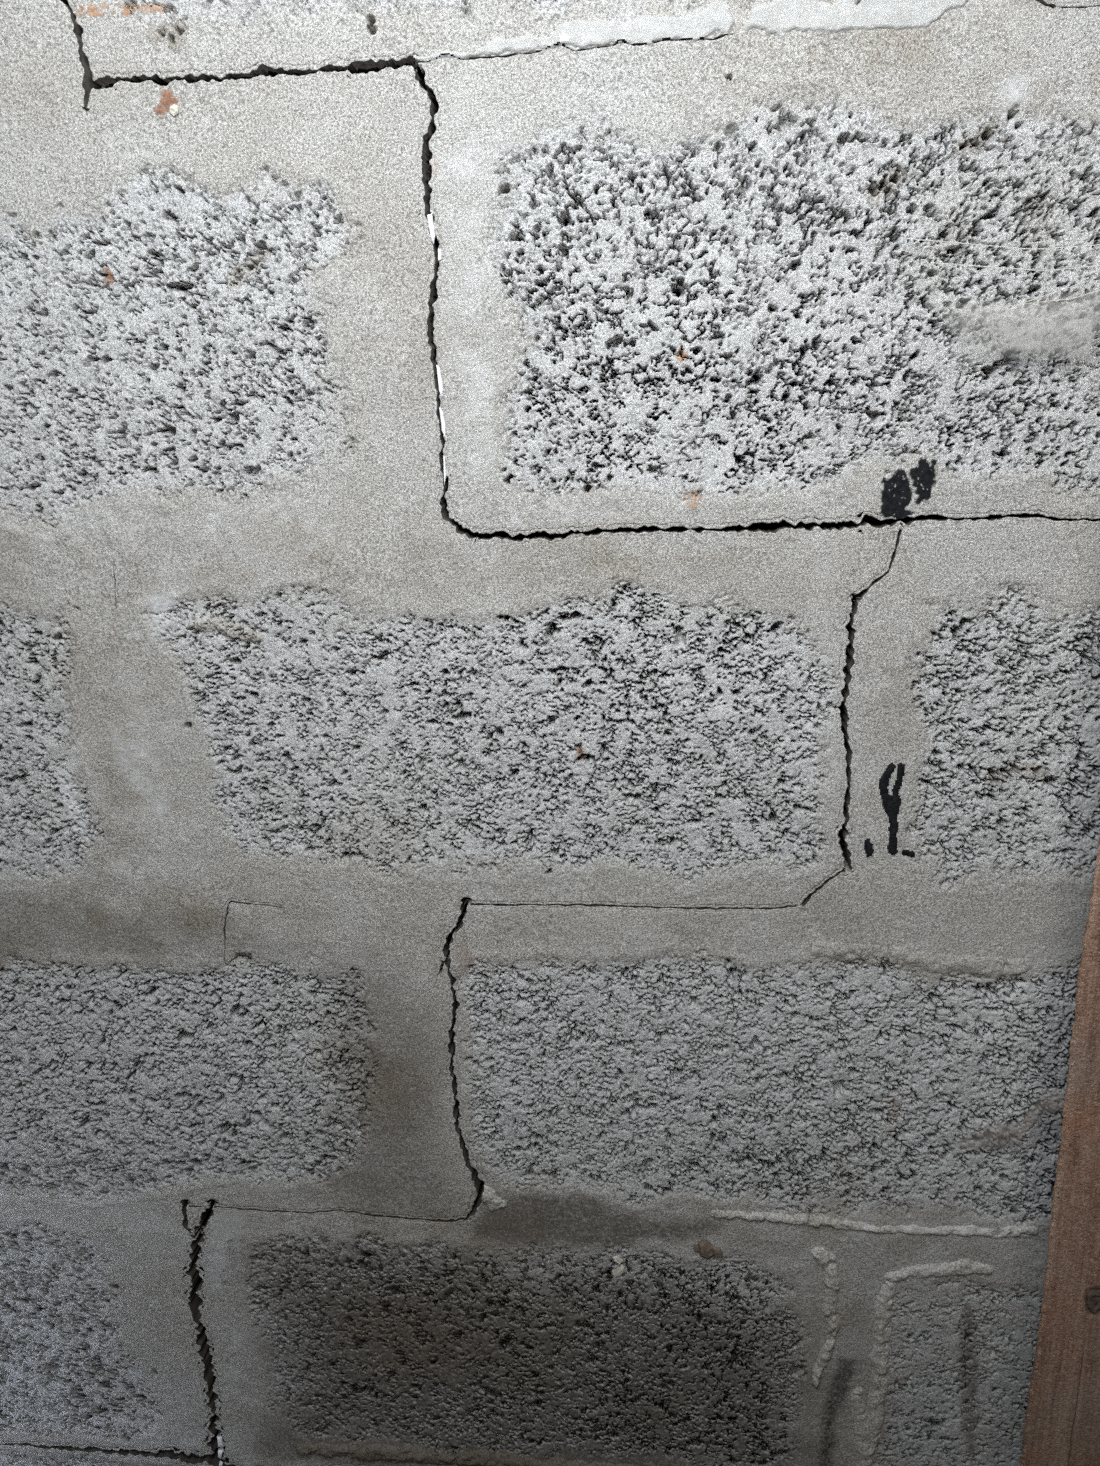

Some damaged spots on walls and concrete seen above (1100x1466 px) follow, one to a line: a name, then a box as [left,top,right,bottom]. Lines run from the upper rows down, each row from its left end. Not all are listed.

crack [55,0,1100,544]
crack [0,527,905,1466]
water stain [274,1252,782,1466]
water stain [477,1198,705,1244]